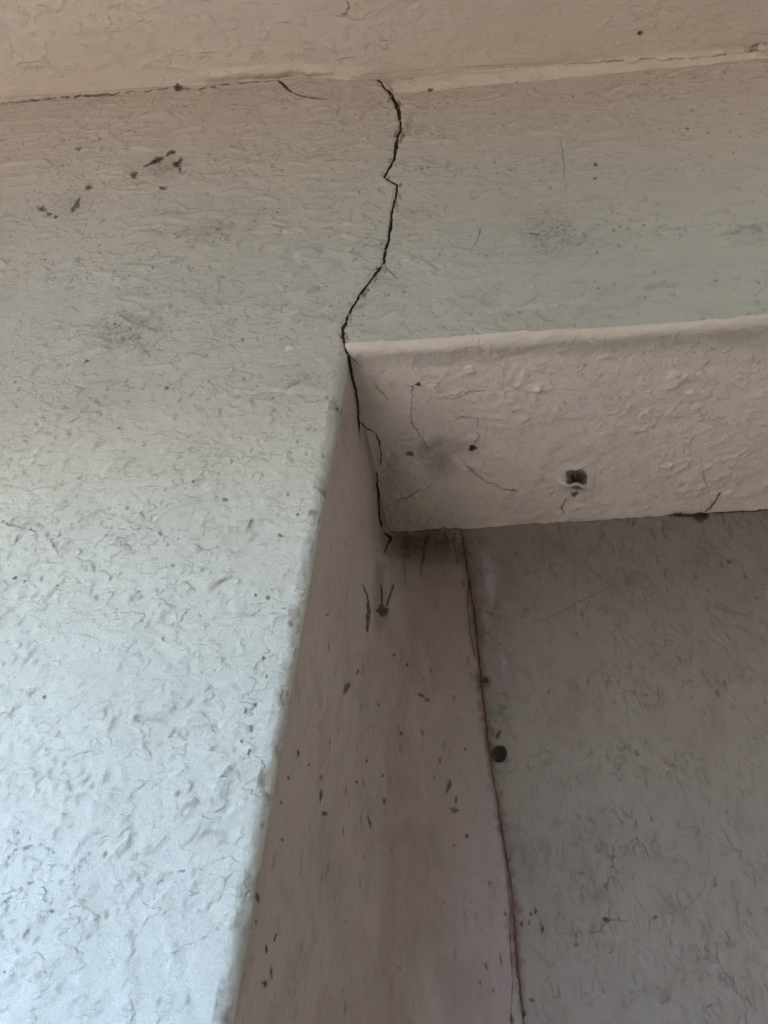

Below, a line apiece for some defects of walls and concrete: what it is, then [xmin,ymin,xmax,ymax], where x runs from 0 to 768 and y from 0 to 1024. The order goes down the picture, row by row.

crack [339,80,405,554]
spalling [551,459,600,497]